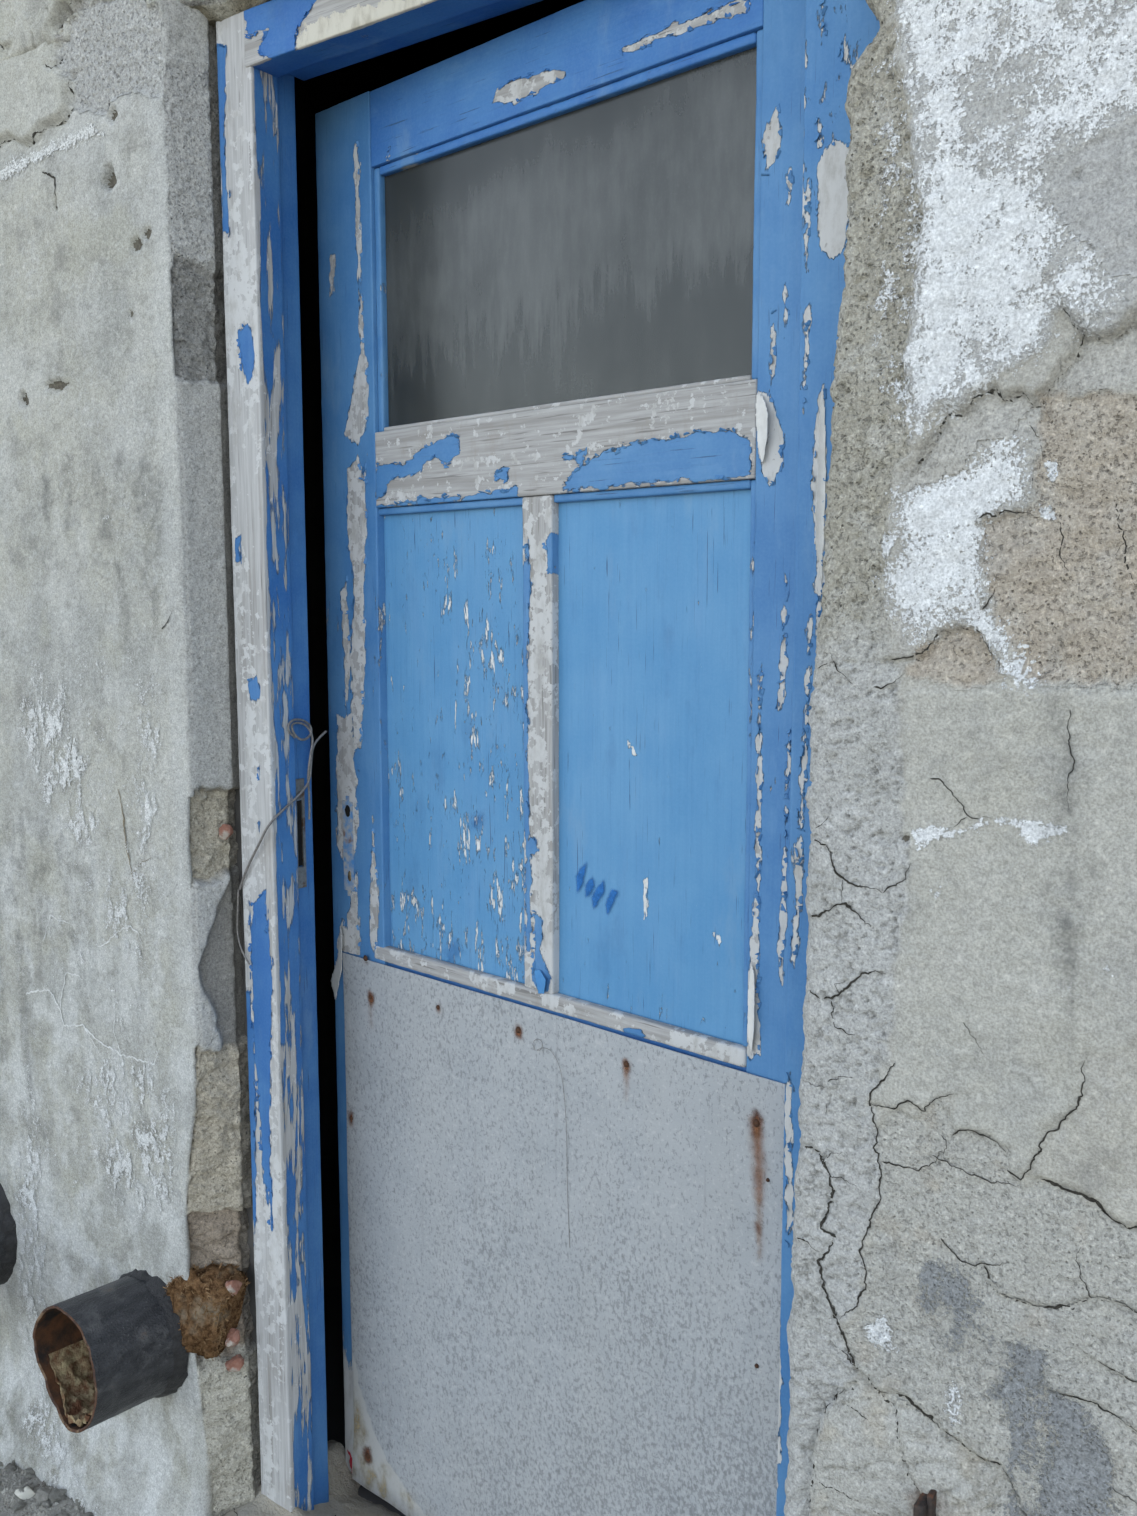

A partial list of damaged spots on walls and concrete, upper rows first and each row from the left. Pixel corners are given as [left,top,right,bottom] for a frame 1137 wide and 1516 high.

crack [0,55,74,195]
peeling [862,0,1137,702]
peeling [562,427,736,481]
peeling [749,394,785,486]
peeling [802,385,827,656]
peeling [778,683,812,967]
crack [1067,710,1075,807]
peeling [331,828,379,1000]
peeling [747,953,762,1061]
crack [810,970,886,1035]
rust [752,1111,762,1193]
crack [797,1063,1137,1516]